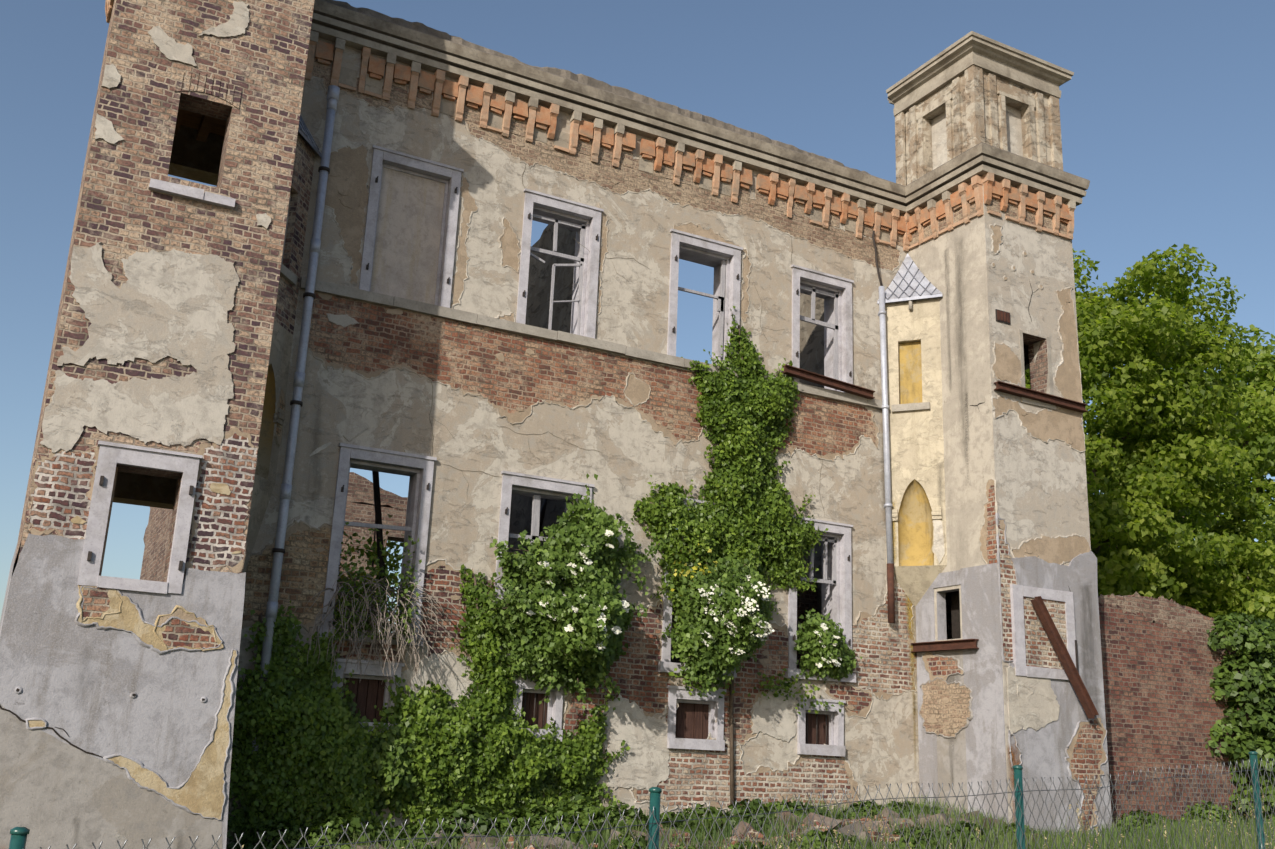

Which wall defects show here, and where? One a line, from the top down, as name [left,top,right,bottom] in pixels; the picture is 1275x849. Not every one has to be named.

spalling [316,143,370,284]
spalling [303,173,710,446]
peeling [26,242,340,633]
spalling [771,393,880,462]
crack [0,705,103,758]
spalling [74,585,238,821]
spalling [562,599,860,812]
spalling [824,576,973,739]
peeling [978,478,1091,769]